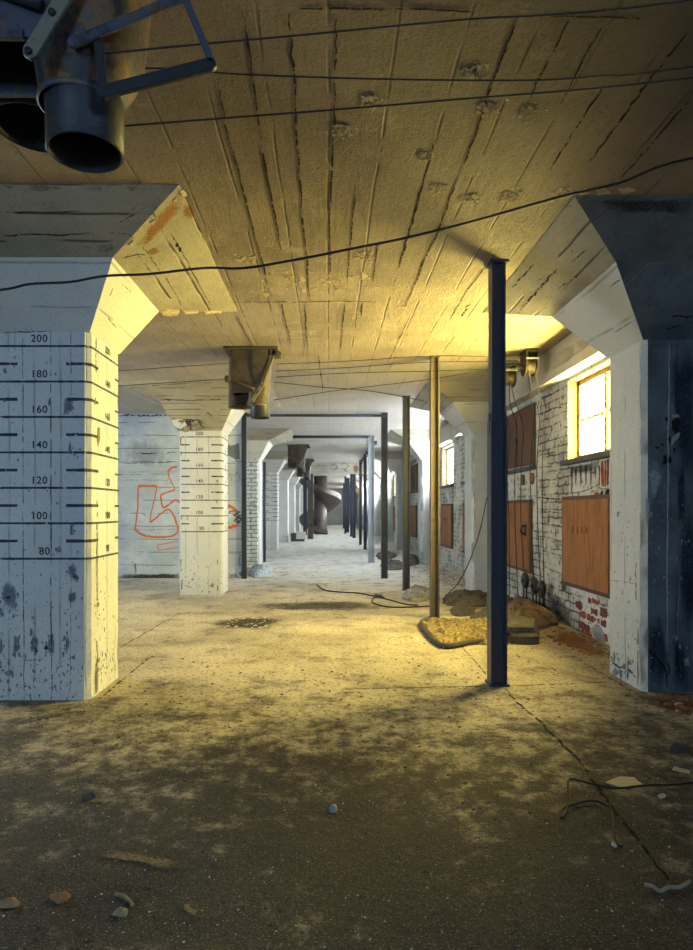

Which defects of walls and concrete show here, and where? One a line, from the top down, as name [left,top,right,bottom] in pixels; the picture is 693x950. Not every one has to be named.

crack [550,86,603,170]
crack [527,15,639,104]
crack [590,33,687,161]
crack [0,211,89,236]
crack [114,214,181,305]
corrosion [145,202,194,254]
crack [219,7,470,391]
crack [373,18,518,361]
crack [507,250,586,340]
crack [505,315,692,880]
crack [359,647,485,689]